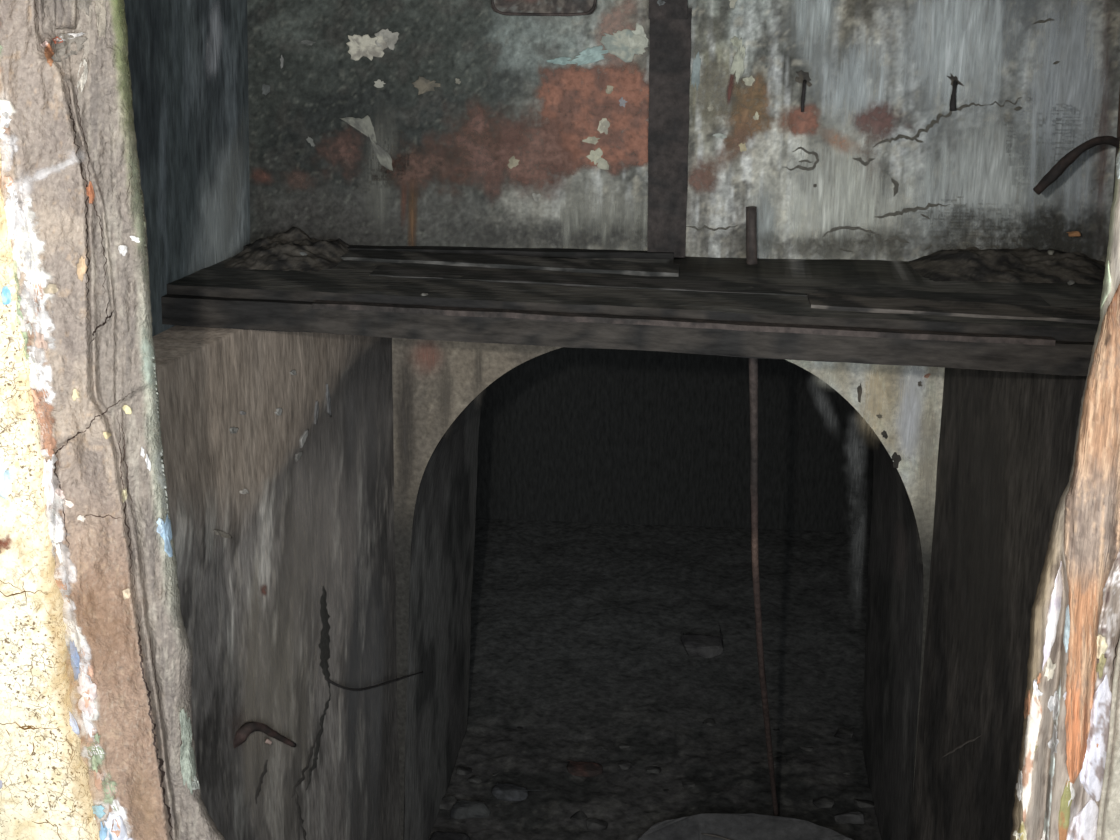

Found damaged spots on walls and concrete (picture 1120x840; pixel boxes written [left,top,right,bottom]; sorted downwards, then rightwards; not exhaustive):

spalling [41,0,107,92]
crack [60,68,114,345]
peeling [118,236,140,256]
peeling [306,0,649,202]
corrosion [780,105,818,134]
crack [786,147,819,187]
damp [799,0,830,59]
damp [757,147,906,256]
damp [824,50,883,113]
crack [823,97,1022,252]
peeling [0,100,133,840]
peeling [1024,657,1067,756]